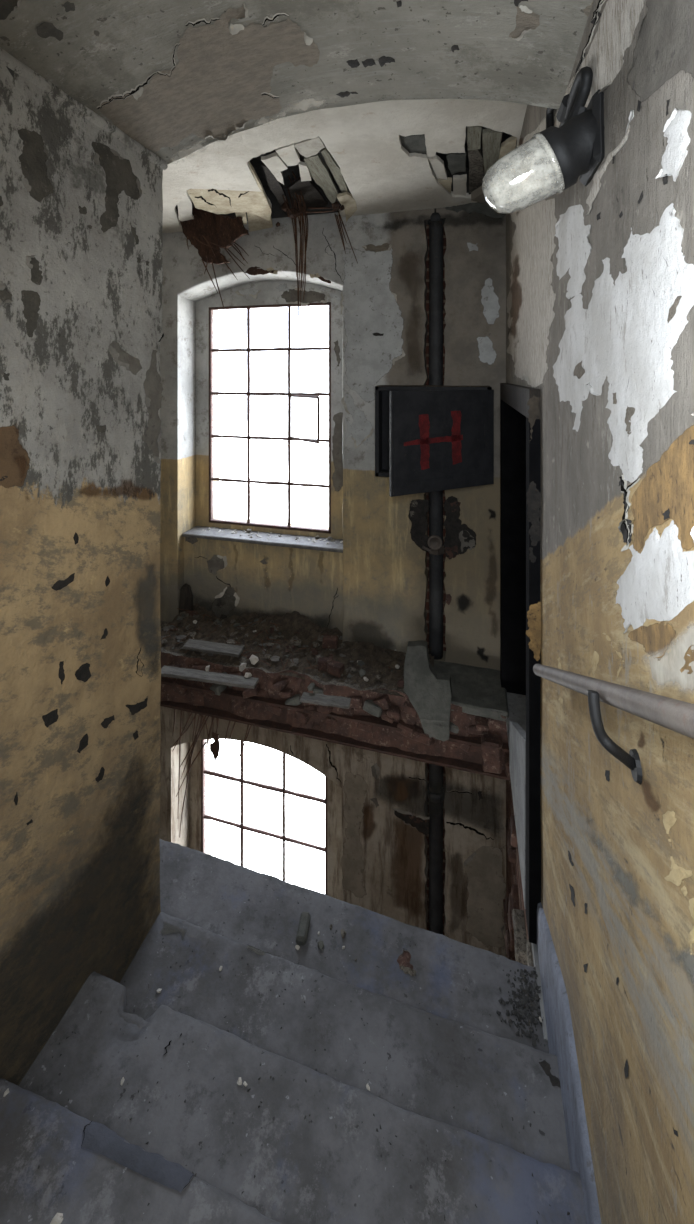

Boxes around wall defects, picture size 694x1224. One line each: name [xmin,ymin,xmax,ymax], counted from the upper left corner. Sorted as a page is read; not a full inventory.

peeling [17,128,54,203]
peeling [78,142,149,266]
peeling [0,255,43,337]
peeling [477,0,694,660]
peeling [108,333,164,464]
peeling [0,425,30,488]
flaking render [408,496,476,560]
crack [619,475,640,546]
peeling [680,645,694,674]
leakage [363,806,375,839]
leakage [380,778,498,914]